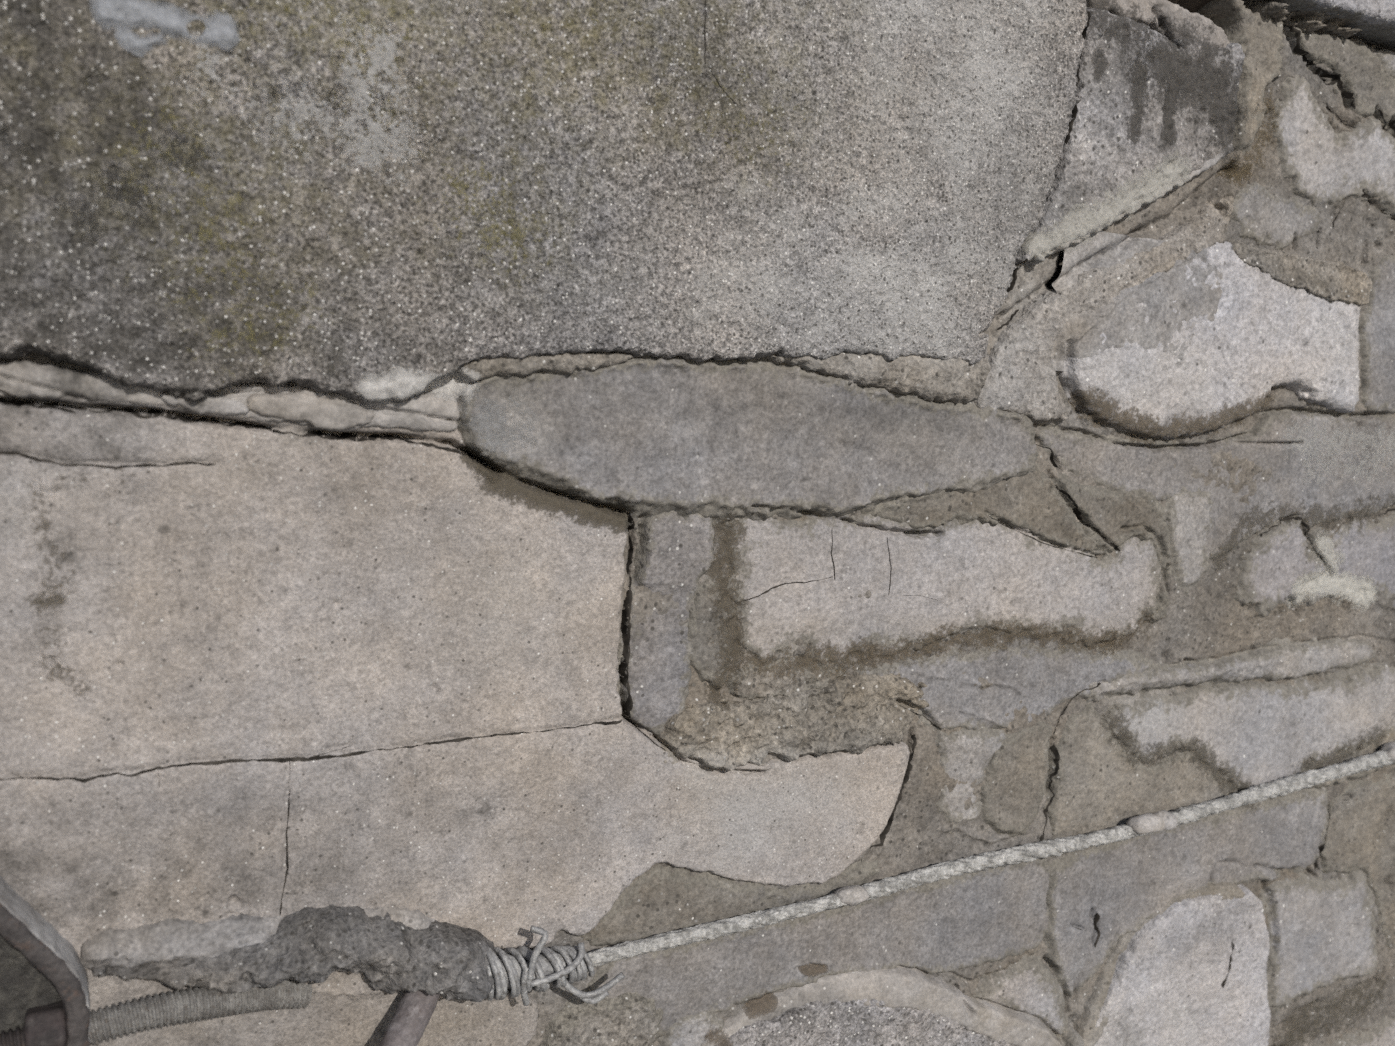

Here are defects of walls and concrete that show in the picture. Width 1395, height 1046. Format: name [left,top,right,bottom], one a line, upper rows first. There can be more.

crack [1064,11,1091,145]
crack [997,258,1028,330]
crack [0,513,667,915]